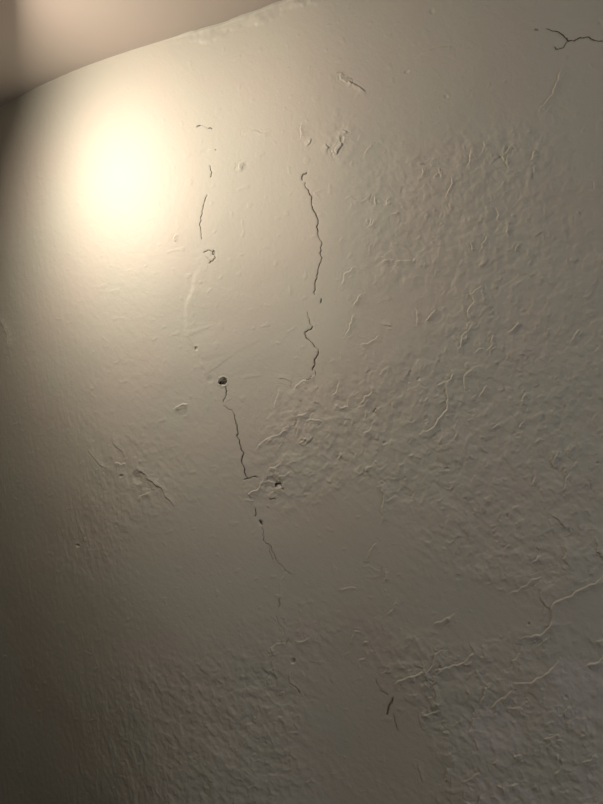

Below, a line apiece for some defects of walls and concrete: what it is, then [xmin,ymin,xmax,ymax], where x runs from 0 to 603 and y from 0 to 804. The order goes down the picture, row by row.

crack [536,29,599,49]
crack [301,172,322,379]
crack [223,387,256,480]